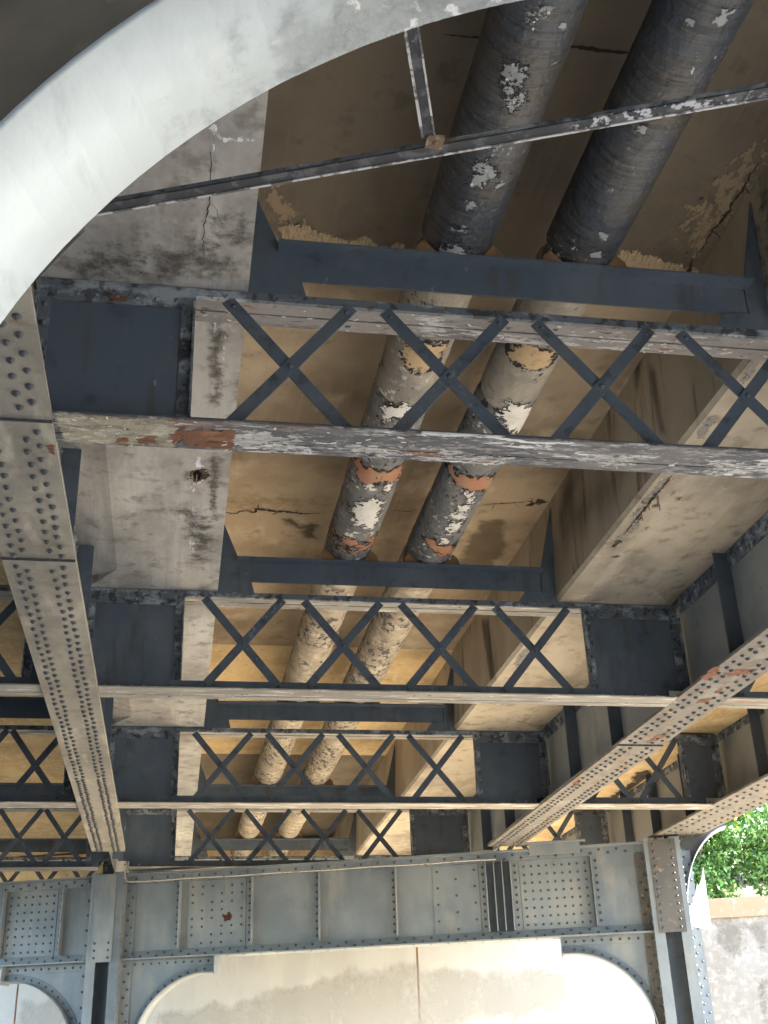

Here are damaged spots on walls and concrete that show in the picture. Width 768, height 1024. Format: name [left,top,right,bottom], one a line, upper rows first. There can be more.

peeling [500,61,529,113]
crack [202,124,219,266]
peeling [94,97,768,249]
crack [687,161,761,272]
mould [158,243,228,277]
leakage [210,323,227,401]
peeling [401,343,449,373]
rust [115,426,237,450]
leakage [178,456,218,553]
spalling [187,468,211,485]
crack [226,505,319,514]
peeling [328,444,516,560]